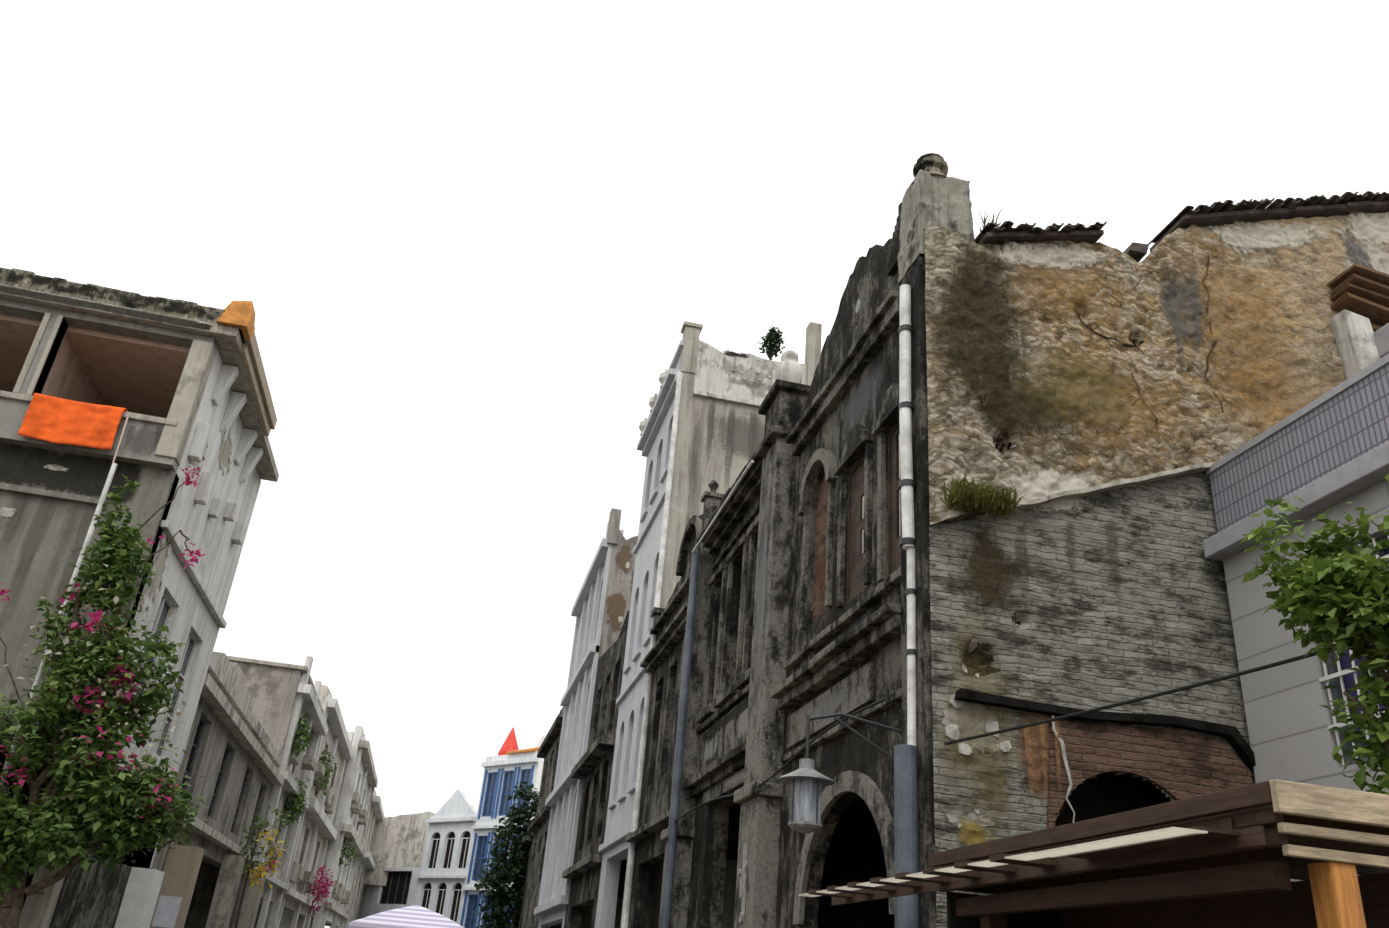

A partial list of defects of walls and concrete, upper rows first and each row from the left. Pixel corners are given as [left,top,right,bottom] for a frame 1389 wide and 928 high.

leakage [0,426,162,502]
leakage [707,405,765,461]
spalling [607,544,634,631]
spalling [959,639,1000,678]
spalling [942,694,1012,756]